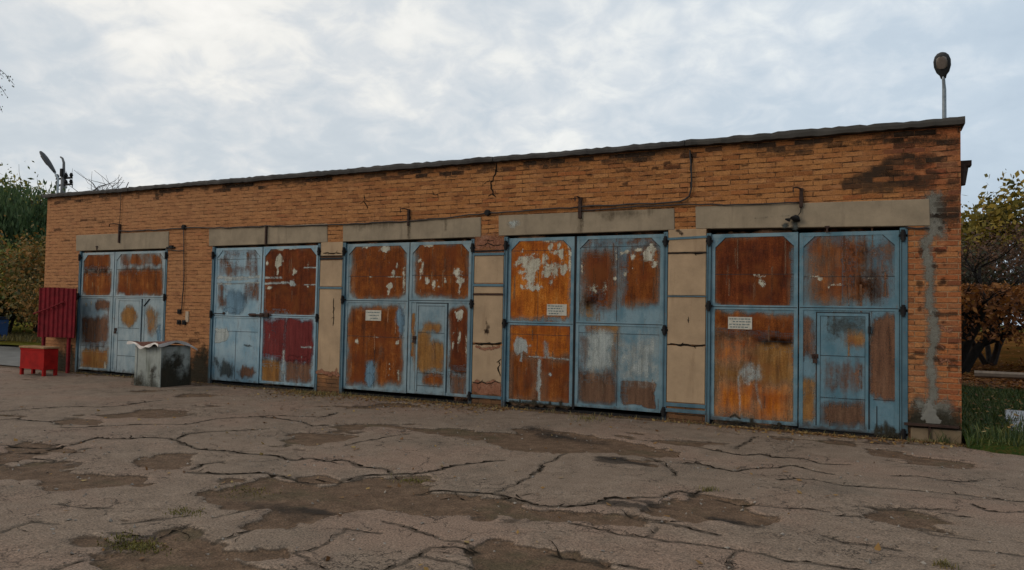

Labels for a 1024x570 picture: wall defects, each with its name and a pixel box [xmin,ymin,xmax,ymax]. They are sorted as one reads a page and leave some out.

crack [484,163,498,197]
rust [81,252,163,369]
rust [218,244,316,318]
peeling [266,248,297,275]
rust [346,240,469,399]
peeling [418,259,464,293]
peeling [514,337,569,401]
peeling [515,240,583,291]
rust [506,236,660,409]
peeling [590,244,657,294]
rust [710,227,900,438]
crack [3,400,1024,570]